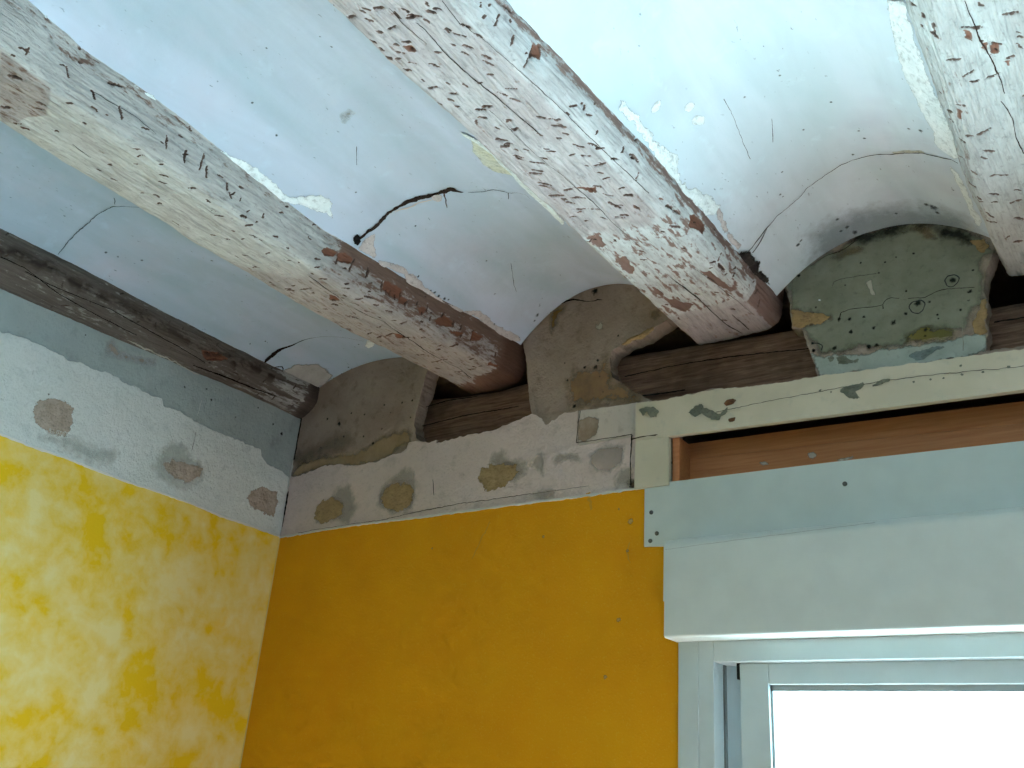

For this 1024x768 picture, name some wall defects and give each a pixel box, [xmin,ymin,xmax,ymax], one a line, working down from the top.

crack [389,1,649,247]
crack [58,198,127,254]
crack [360,187,529,240]
crack [748,153,957,253]
spalling [791,310,830,328]
crack [264,337,316,370]
peeling [811,299,988,399]
spalling [33,398,74,437]
peeling [689,399,736,422]
spalling [478,463,519,492]
spalling [246,486,278,517]
spalling [314,497,343,524]